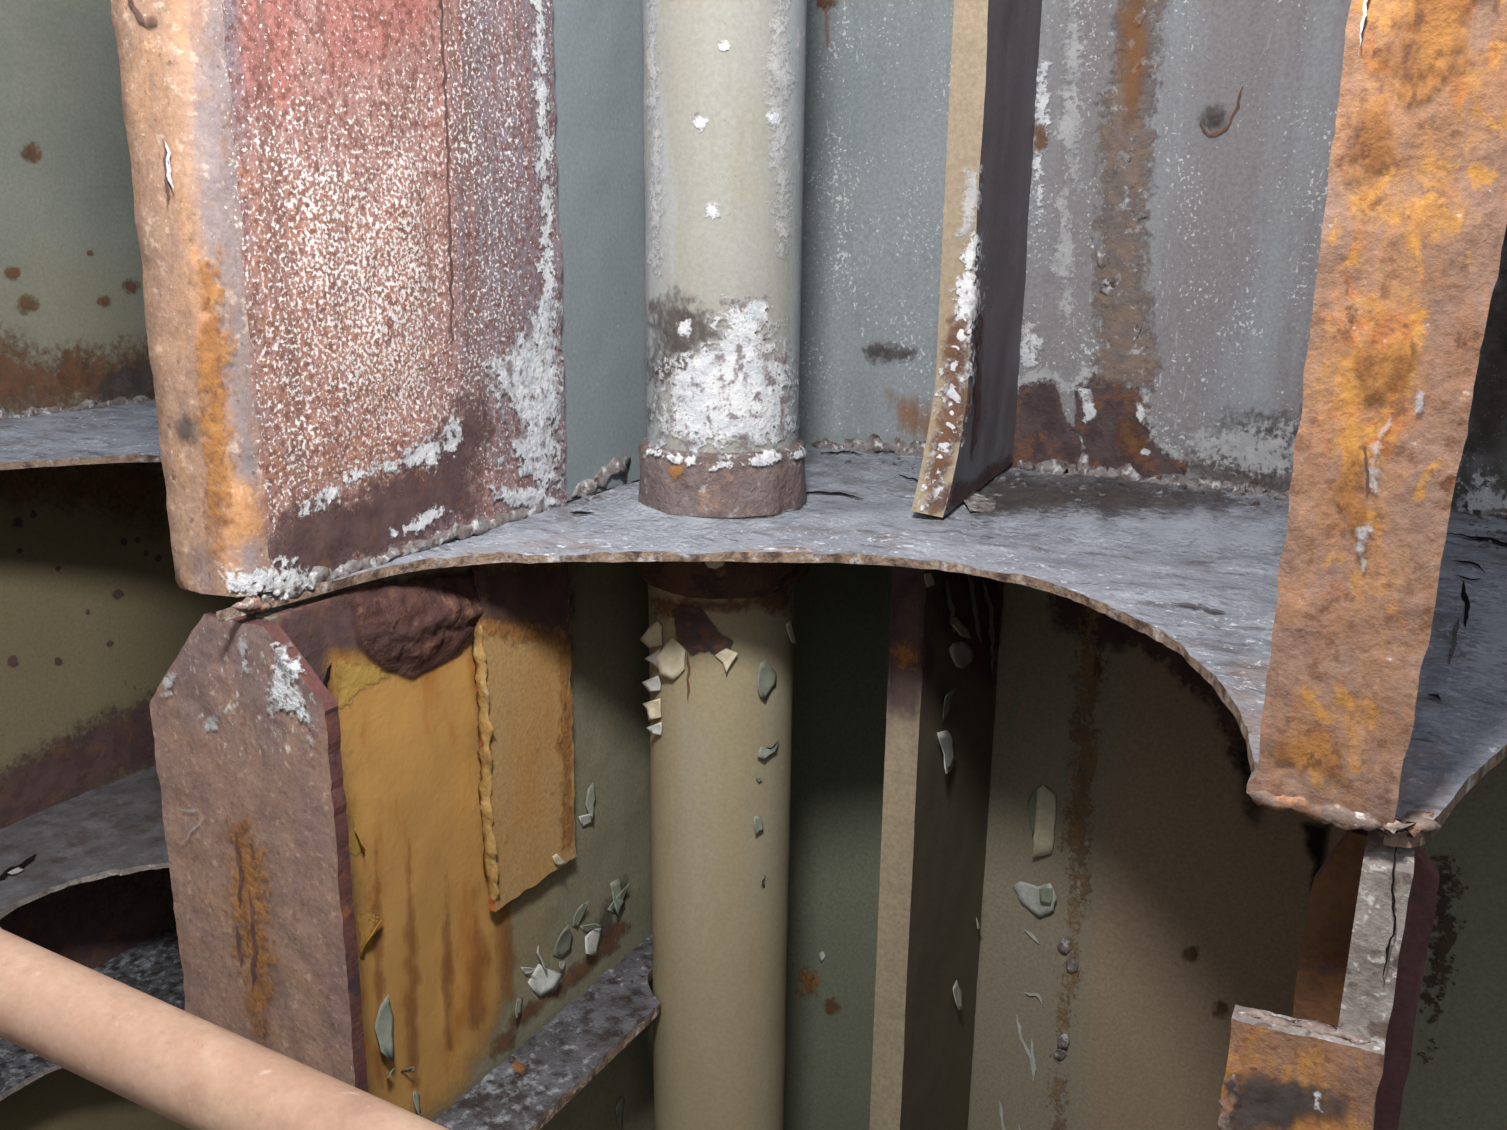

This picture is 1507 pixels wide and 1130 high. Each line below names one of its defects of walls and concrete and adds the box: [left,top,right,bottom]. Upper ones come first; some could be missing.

rust [1373,0,1471,102]
efflorescence [481,0,750,555]
rust [0,335,155,412]
efflorescence [646,293,922,510]
rust [901,295,1014,514]
rust [267,396,493,585]
peeling [639,604,738,735]
rust [273,562,631,1117]
peeling [1027,785,1057,858]
peeling [515,877,630,1018]
peeling [1013,881,1057,944]
crack [1382,847,1397,986]